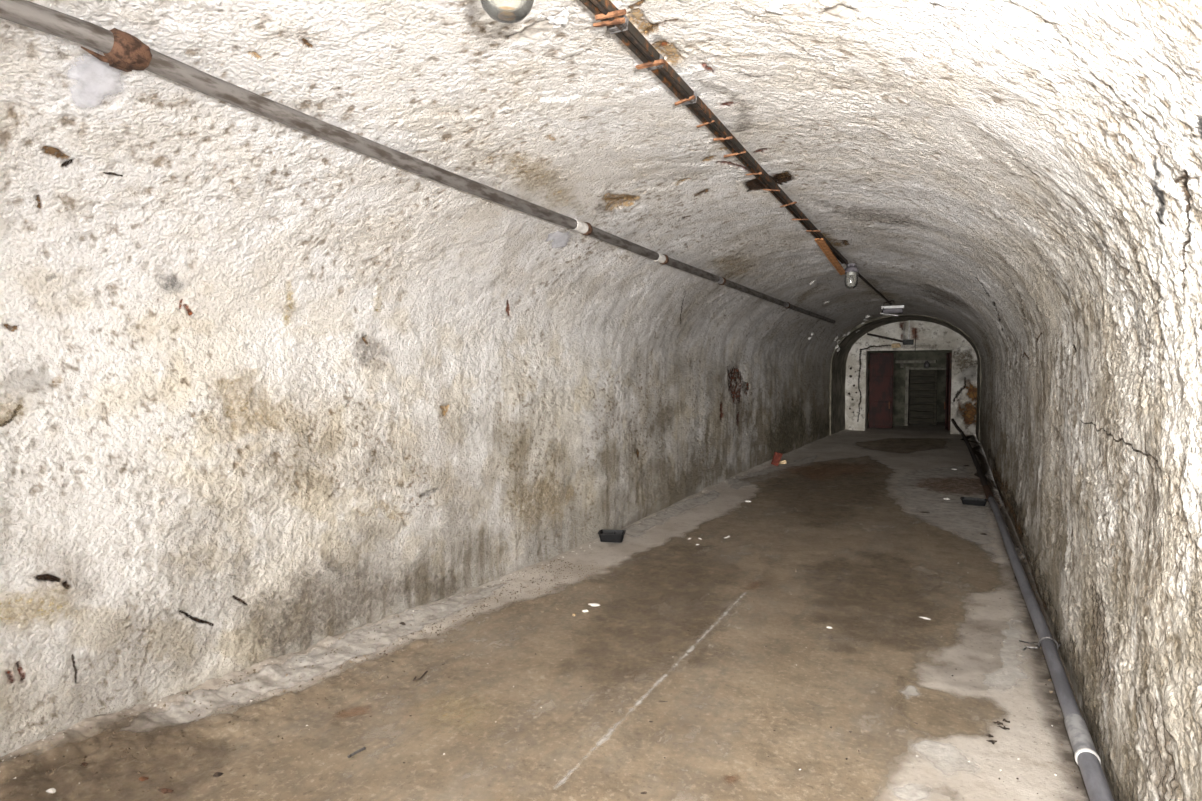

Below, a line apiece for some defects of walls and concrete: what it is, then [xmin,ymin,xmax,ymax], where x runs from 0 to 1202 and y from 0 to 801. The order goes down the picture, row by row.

corrosion [627,0,680,65]
water stain [1153,162,1165,225]
crack [1080,420,1164,472]